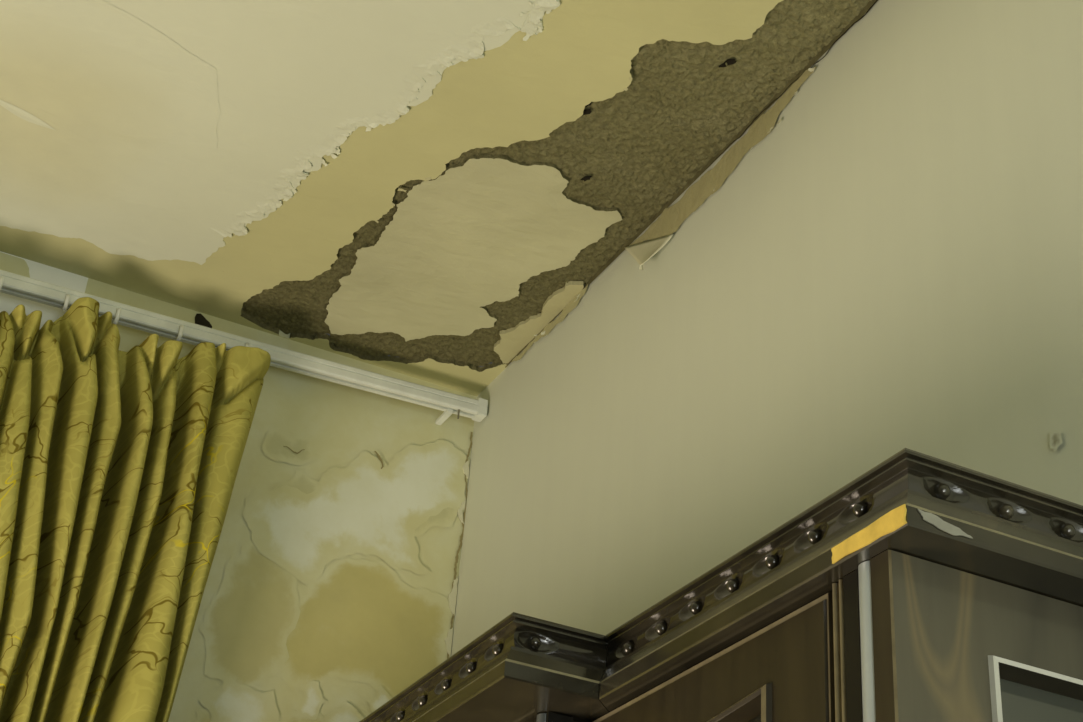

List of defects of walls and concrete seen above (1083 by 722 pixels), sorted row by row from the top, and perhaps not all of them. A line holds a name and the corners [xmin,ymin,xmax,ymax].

flaking render [0,0,872,397]
crack [582,0,878,290]
crack [505,310,563,368]
damp [262,428,318,494]
damp [199,539,453,698]